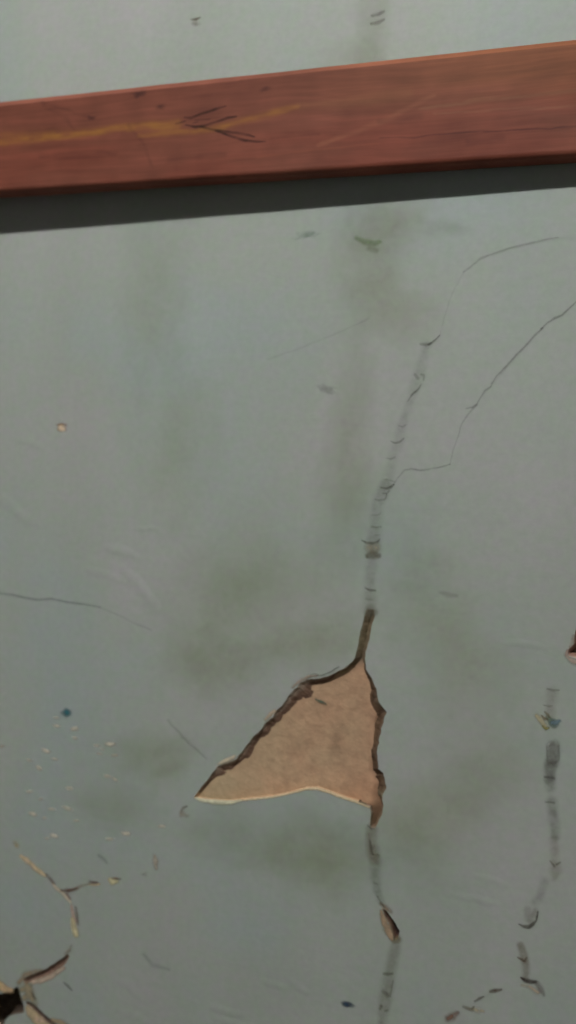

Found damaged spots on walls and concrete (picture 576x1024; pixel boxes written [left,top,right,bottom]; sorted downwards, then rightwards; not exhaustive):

crack [350,609,375,666]
flaking render [194,653,387,824]
crack [360,789,384,828]
crack [380,906,400,941]
spalling [0,954,70,1024]
crack [446,958,536,1021]